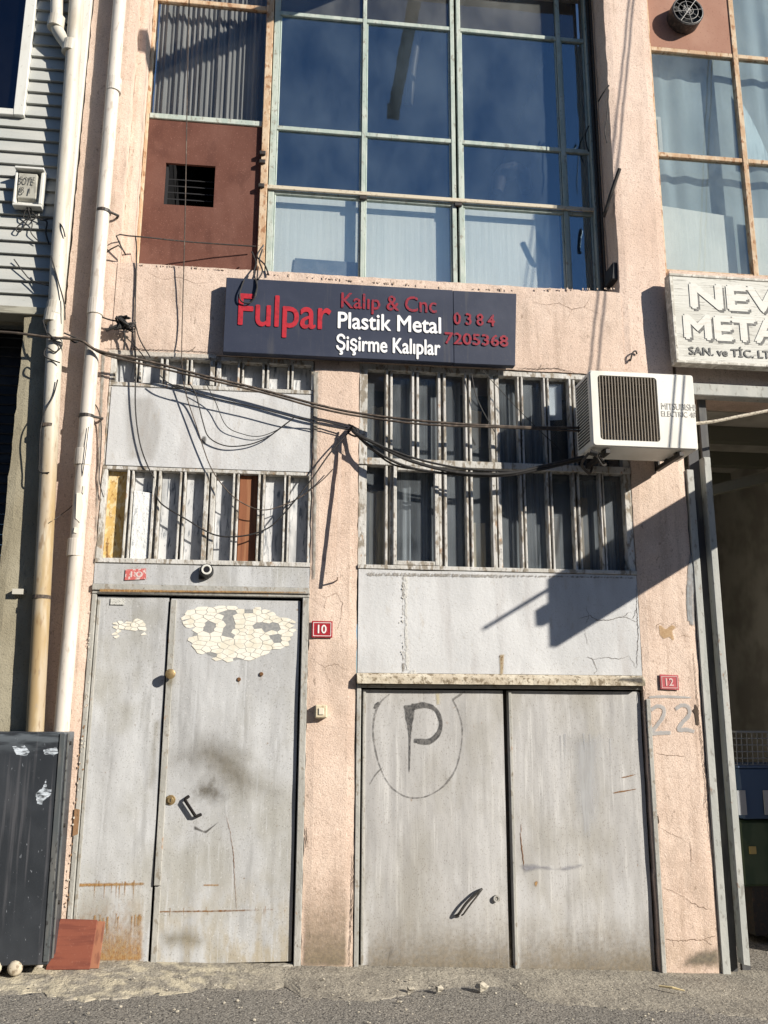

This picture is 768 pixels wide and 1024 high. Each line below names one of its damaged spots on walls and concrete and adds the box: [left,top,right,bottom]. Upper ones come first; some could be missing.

crack [579,585,714,865]
corrosion [79,880,143,895]
corrosion [94,914,142,961]